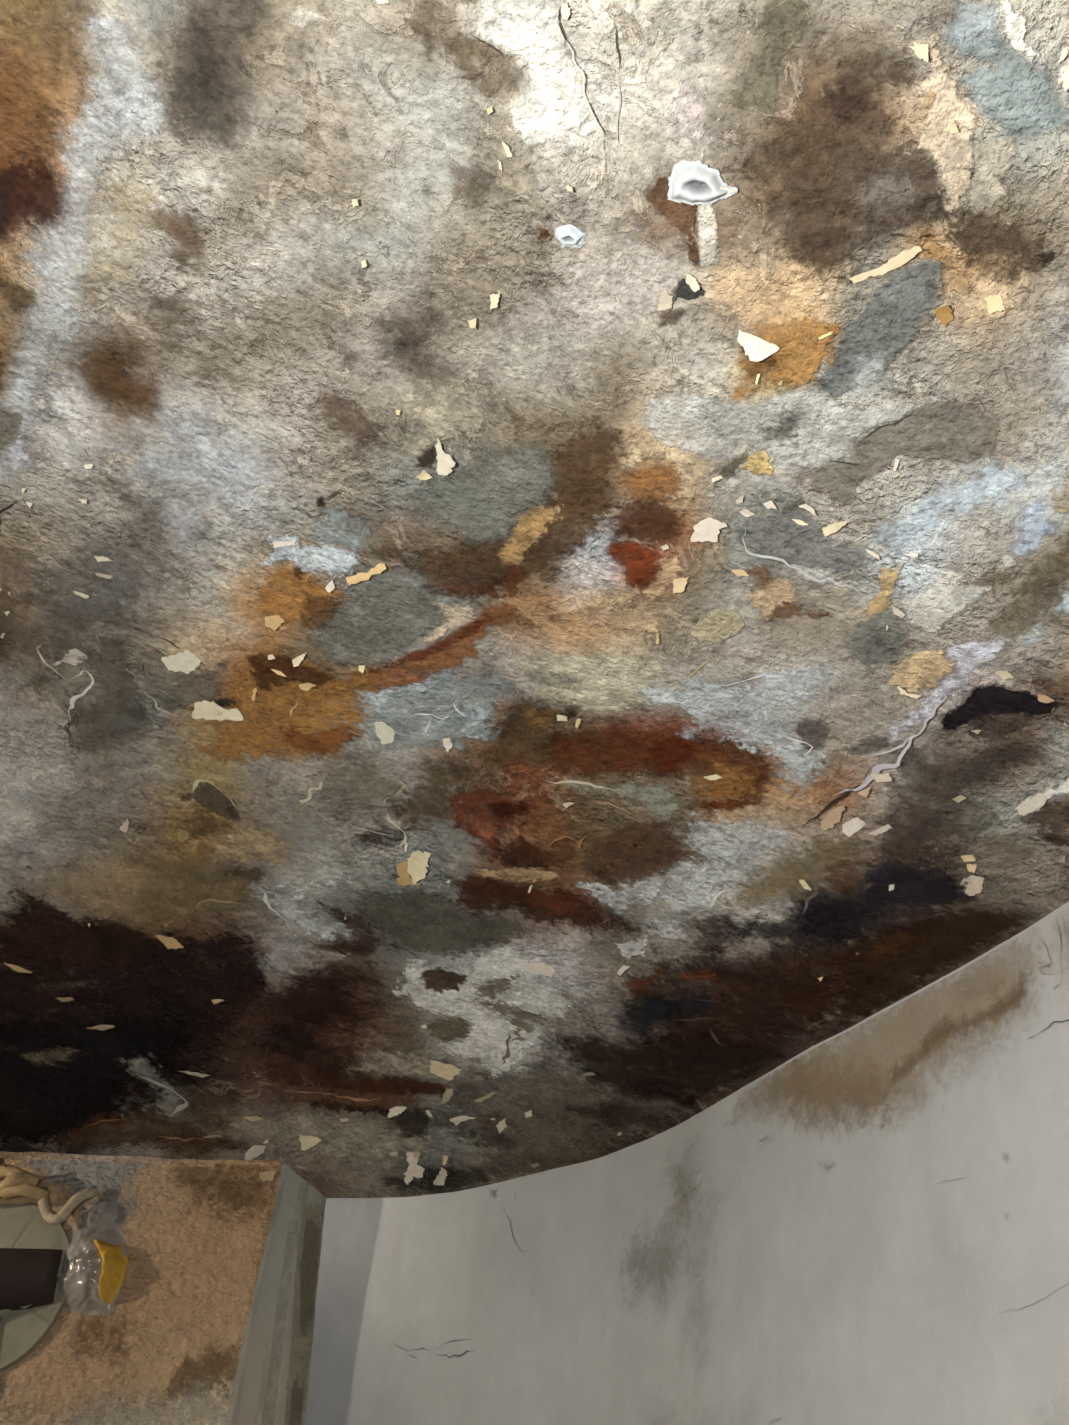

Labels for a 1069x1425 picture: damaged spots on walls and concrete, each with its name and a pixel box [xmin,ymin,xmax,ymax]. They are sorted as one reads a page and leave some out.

peeling [463,0,705,384]
spalling [667,85,738,206]
water stain [741,48,1062,280]
peeling [911,0,1069,213]
peeling [355,668,515,752]
rust [195,428,710,764]
water stain [519,504,1069,972]
peeling [642,246,1019,699]
water stain [874,466,1024,546]
spalling [940,670,1069,736]
water stain [0,853,684,1425]
water stain [760,949,1025,1113]